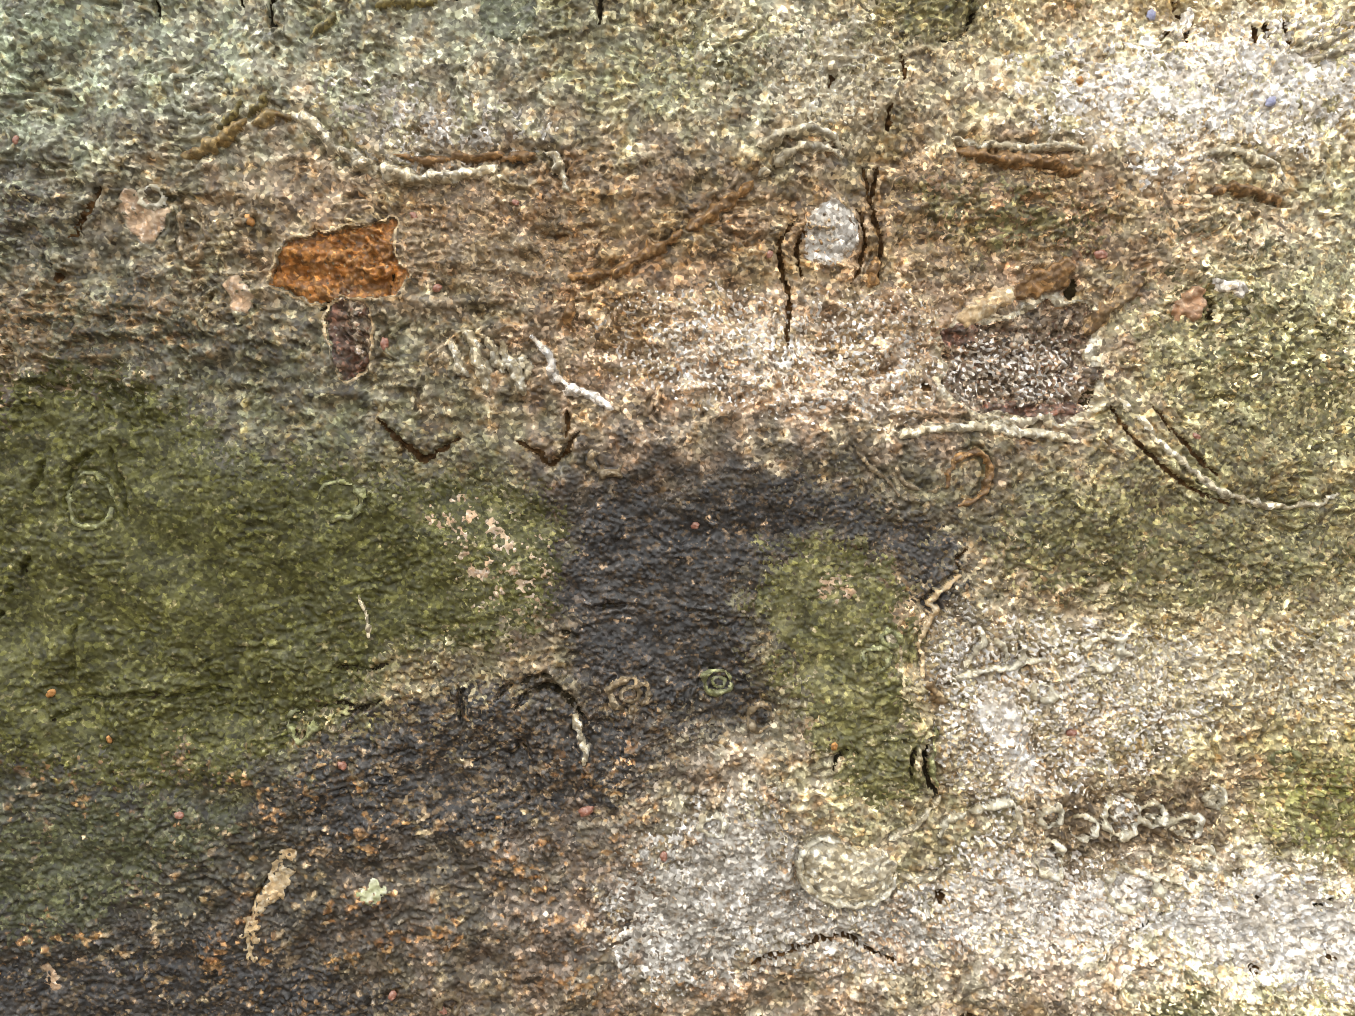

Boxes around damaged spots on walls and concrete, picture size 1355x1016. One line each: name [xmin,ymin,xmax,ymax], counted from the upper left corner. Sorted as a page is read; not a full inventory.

crack [776,221,810,354]
damp [591,278,1091,431]
damp [253,442,1355,1016]
damp [0,906,427,1016]